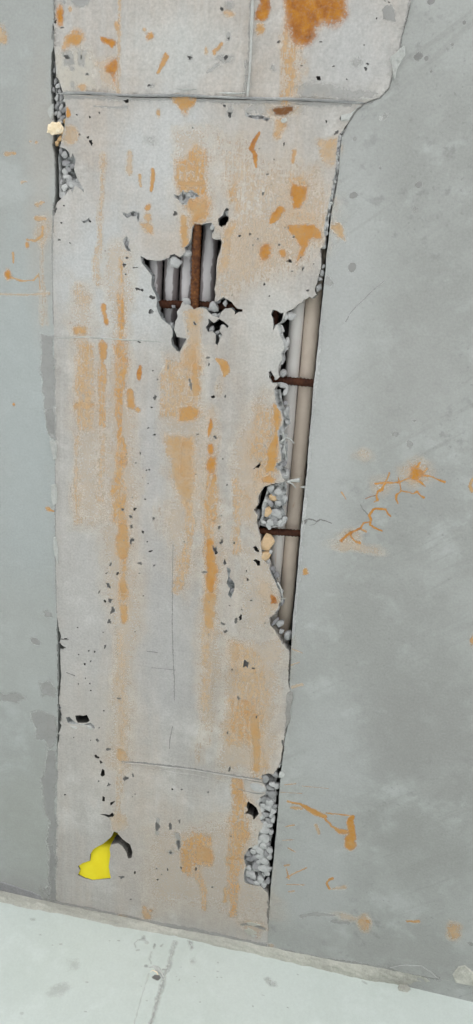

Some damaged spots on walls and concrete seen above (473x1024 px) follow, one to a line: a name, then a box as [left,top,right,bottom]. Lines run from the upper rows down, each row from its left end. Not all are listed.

spalling [47,61,84,199]
spalling [123,208,243,352]
rust [176,145,209,247]
rust [219,132,344,292]
rust [273,0,348,136]
rust [73,261,142,820]
rust [160,308,218,711]
rust [250,404,281,493]
spalling [259,309,323,650]
rust [339,462,446,552]
rust [223,645,269,917]
rust [282,783,356,851]